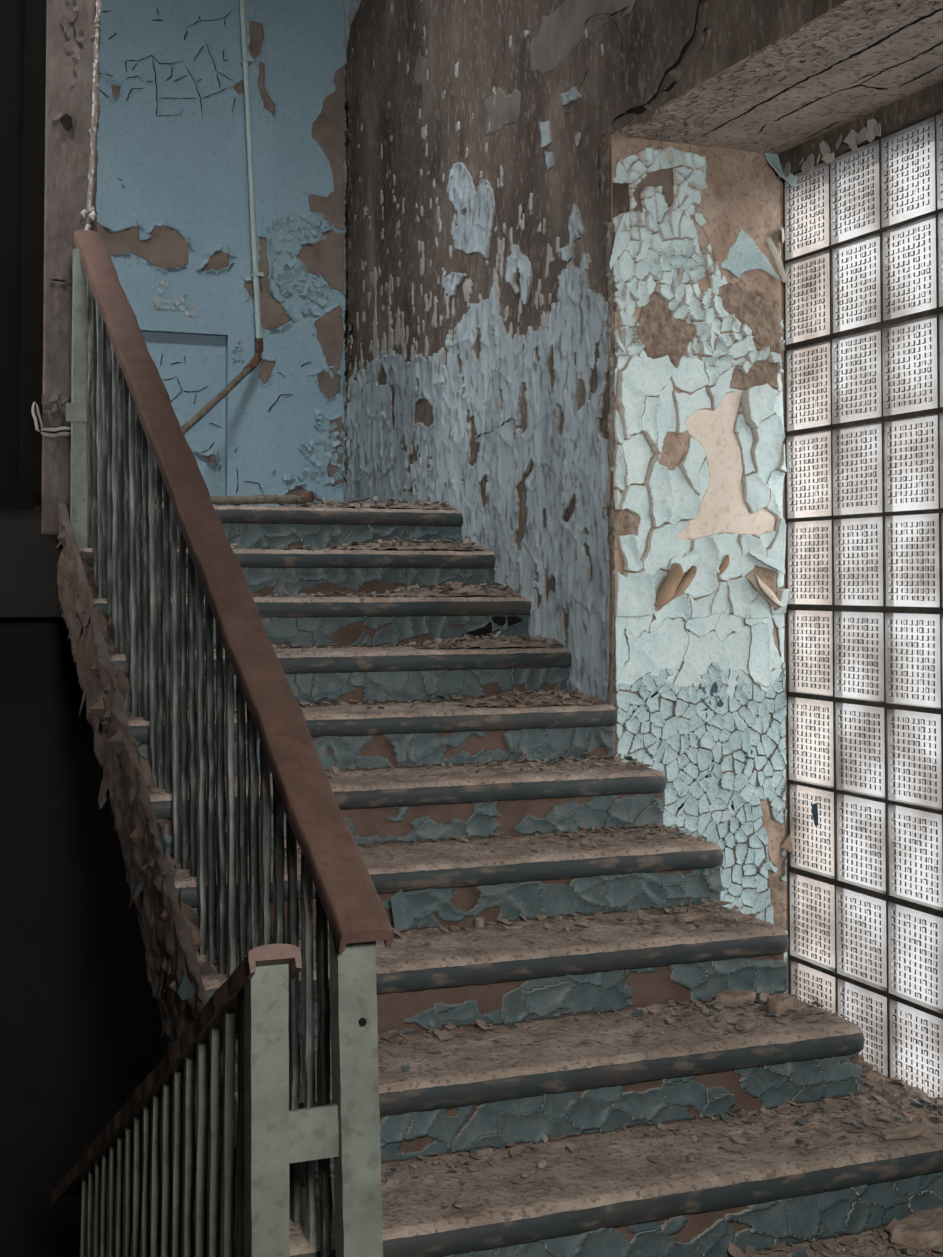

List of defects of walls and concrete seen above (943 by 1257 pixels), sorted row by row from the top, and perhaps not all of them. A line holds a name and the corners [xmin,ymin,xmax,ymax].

crack [99,8,237,121]
crack [564,69,590,114]
crack [584,6,628,54]
crack [595,0,712,194]
peeling [60,0,943,713]
peeling [205,813,301,869]
peeling [313,726,652,780]
peeling [344,793,703,859]
peeling [383,799,805,955]
crack [614,610,788,993]
peeling [691,682,726,726]
peeling [378,957,845,1077]